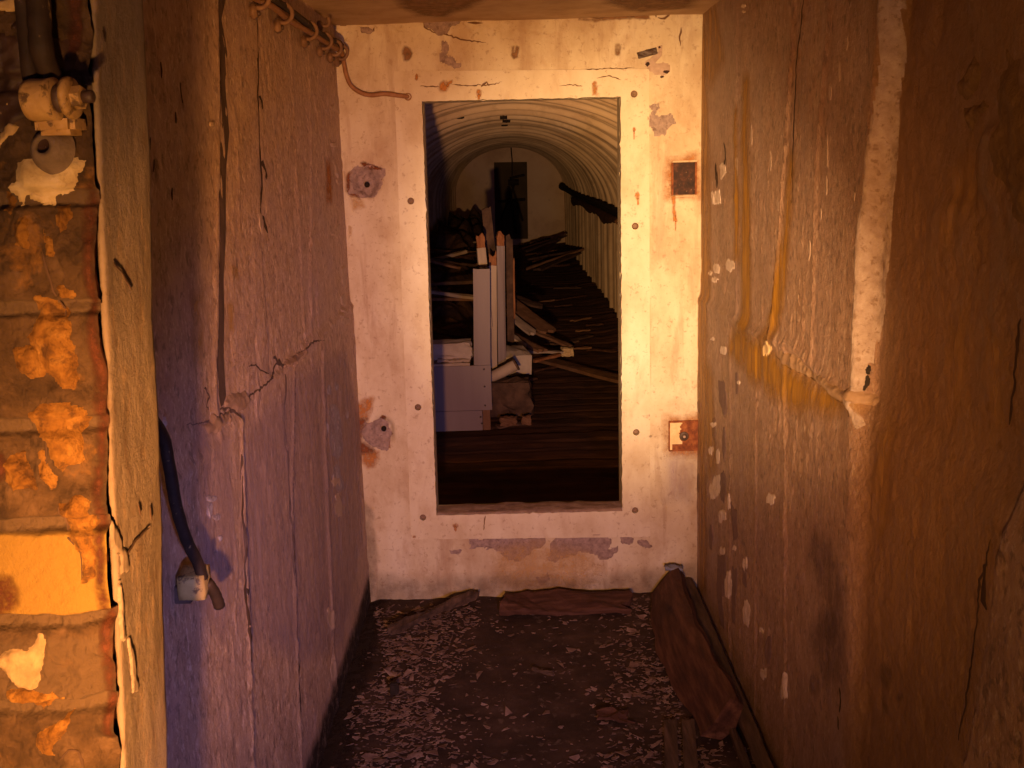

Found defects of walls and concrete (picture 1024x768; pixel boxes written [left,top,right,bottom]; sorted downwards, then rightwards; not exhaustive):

spalling [330,142,386,198]
peeling [648,104,676,136]
damp [730,0,907,429]
crack [187,0,324,579]
corrosion [667,7,721,588]
peeling [762,340,772,356]
crack [1009,318,1021,425]
spalling [360,418,393,451]
crack [127,505,152,555]
peeling [449,534,652,587]
peeling [697,372,772,680]
crack [958,539,991,741]